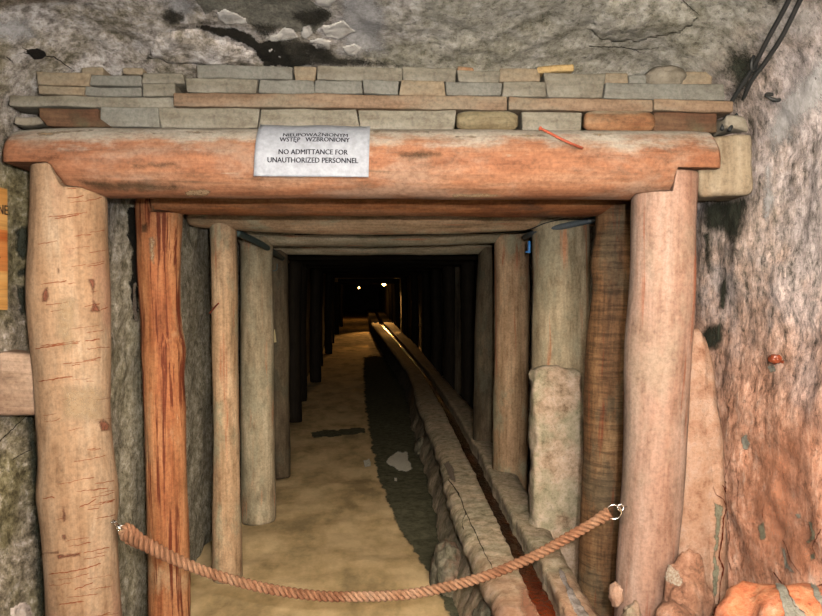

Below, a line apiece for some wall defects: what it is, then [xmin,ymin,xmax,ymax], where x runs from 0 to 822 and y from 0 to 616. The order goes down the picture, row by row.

peeling [196,0,362,58]